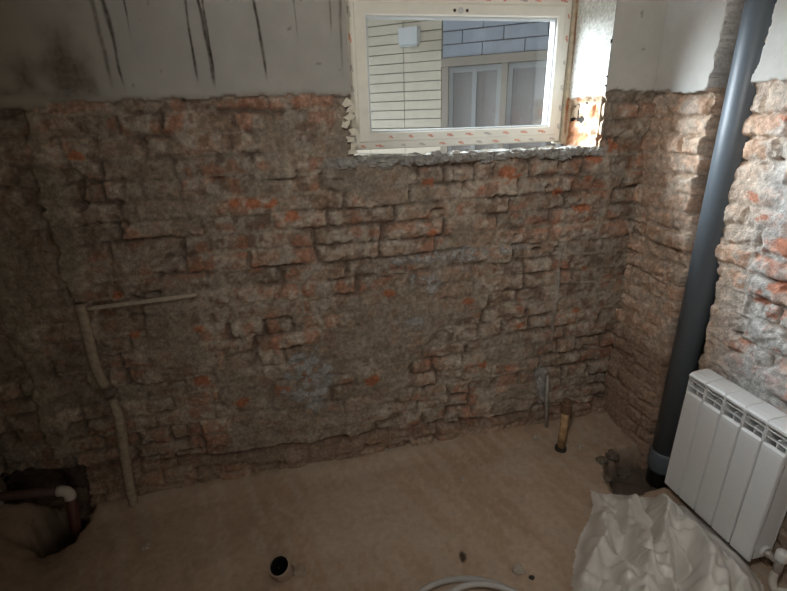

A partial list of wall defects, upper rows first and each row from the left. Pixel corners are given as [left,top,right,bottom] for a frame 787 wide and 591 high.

leakage [197,0,214,72]
spalling [336,97,605,169]
spalling [600,445,671,496]